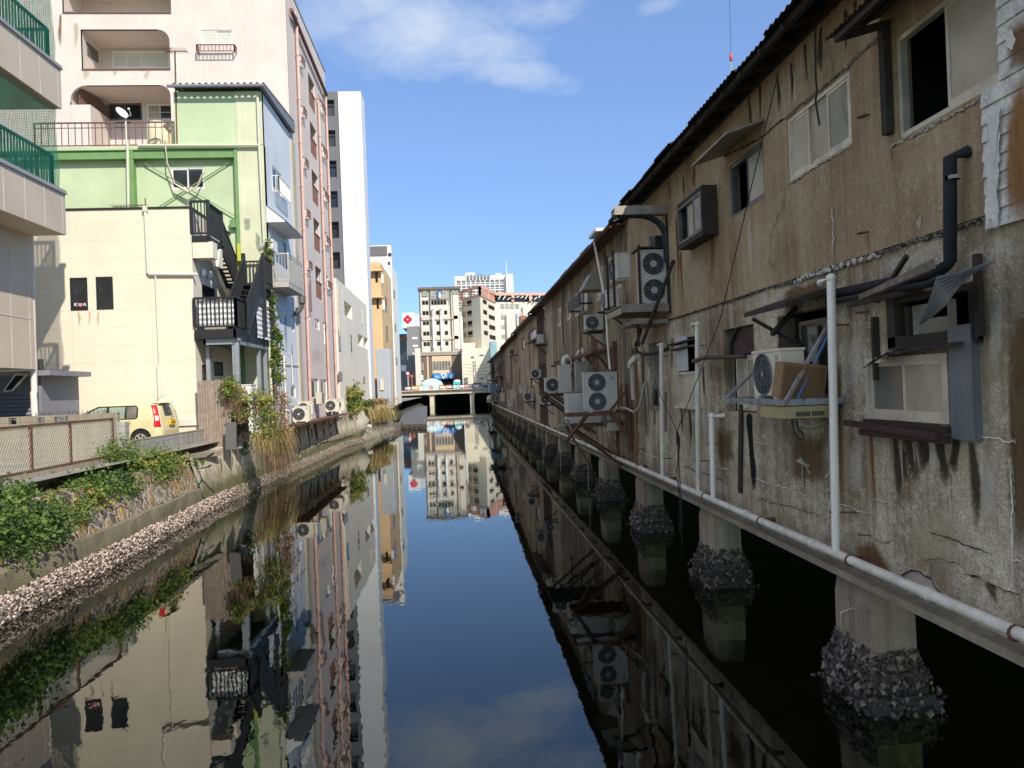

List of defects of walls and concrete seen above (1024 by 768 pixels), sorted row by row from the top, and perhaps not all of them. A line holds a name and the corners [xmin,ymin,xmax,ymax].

damp [748,27,847,123]
peeling [1006,13,1016,49]
peeling [982,106,1000,226]
rust [1006,84,1024,213]
damp [891,439,994,517]
crack [924,436,1023,591]